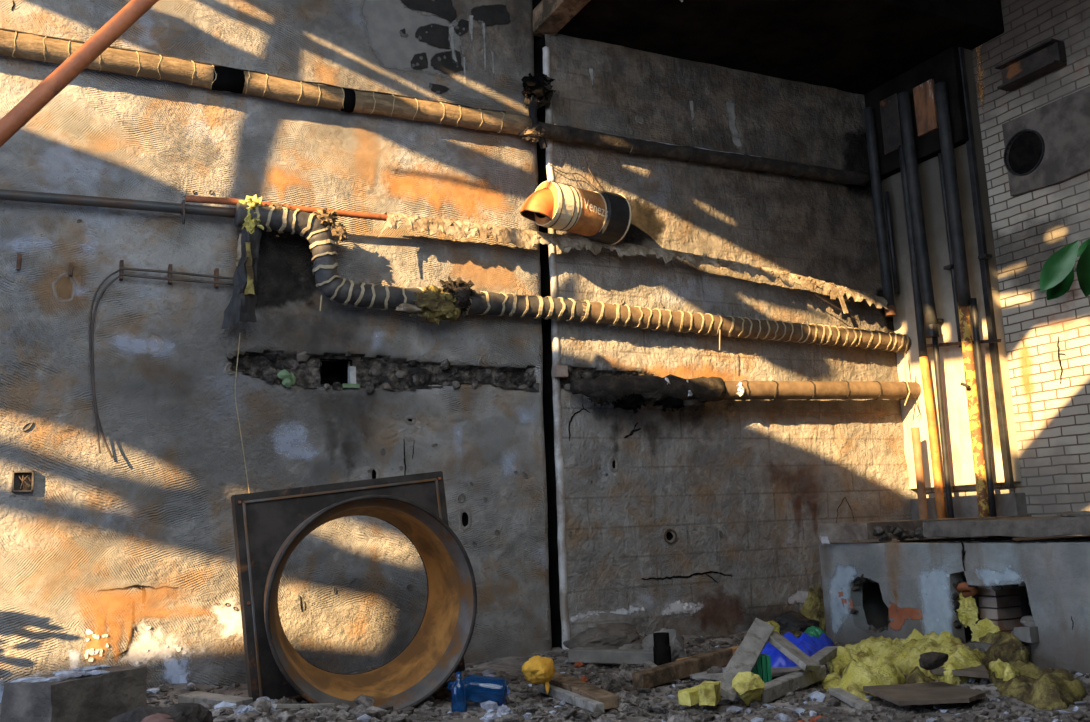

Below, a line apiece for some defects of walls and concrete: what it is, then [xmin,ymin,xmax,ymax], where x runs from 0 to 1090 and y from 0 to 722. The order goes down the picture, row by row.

peeling [399,0,511,94]
rust [83,589,171,657]
crack [642,571,732,583]
peeling [888,569,952,635]
peeling [979,565,1020,585]
spalling [1014,616,1040,643]